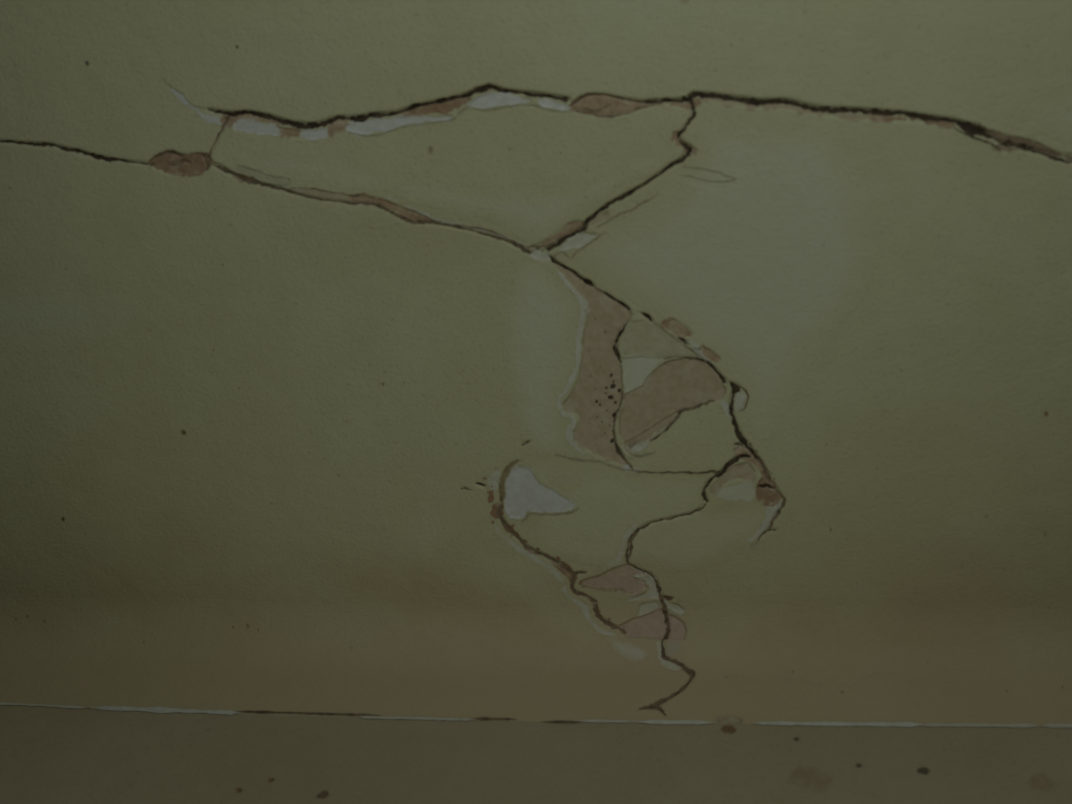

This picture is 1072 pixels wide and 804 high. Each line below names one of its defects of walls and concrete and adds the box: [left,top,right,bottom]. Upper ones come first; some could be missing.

crack [0,77,1072,262]
spalling [550,257,727,468]
crack [0,382,786,725]
peeling [504,463,581,522]
crack [751,720,1072,728]